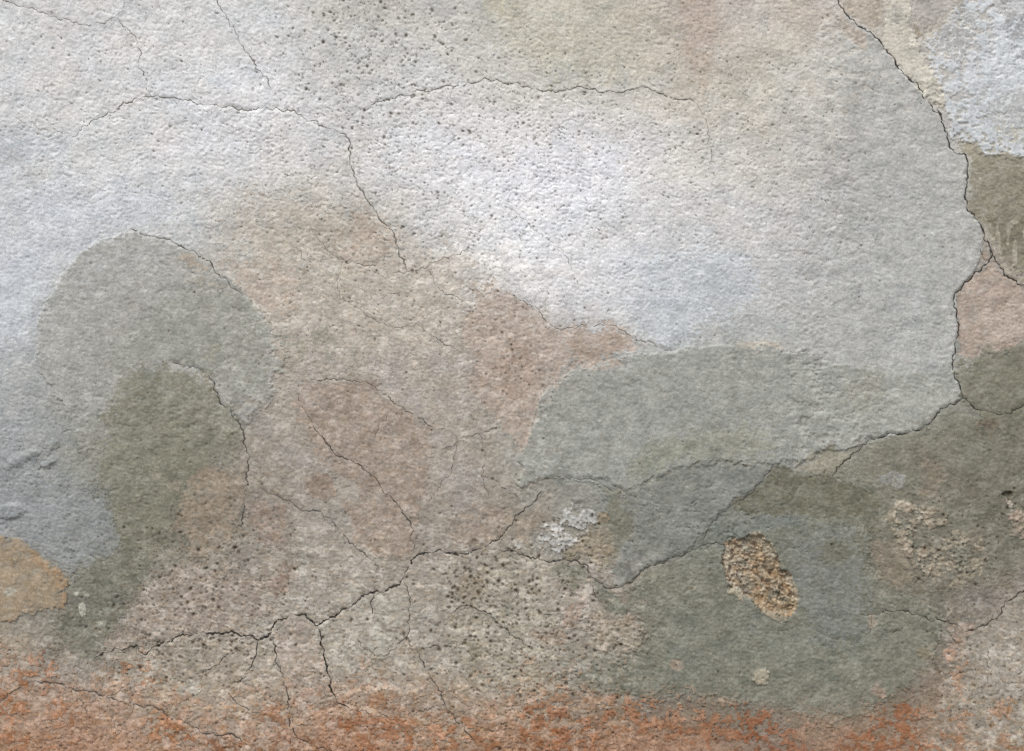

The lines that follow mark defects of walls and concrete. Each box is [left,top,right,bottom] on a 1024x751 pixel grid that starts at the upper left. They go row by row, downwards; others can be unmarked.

peeling [0,428,125,622]
crack [0,680,253,748]
flaking render [34,227,434,713]
crack [3,0,473,349]
damp [0,111,514,666]
crack [95,362,774,750]
rust [0,634,1024,751]
crack [367,74,713,164]
flaking render [419,0,1024,702]
damp [510,383,1024,729]
damp [830,366,889,421]
crack [832,0,1024,476]